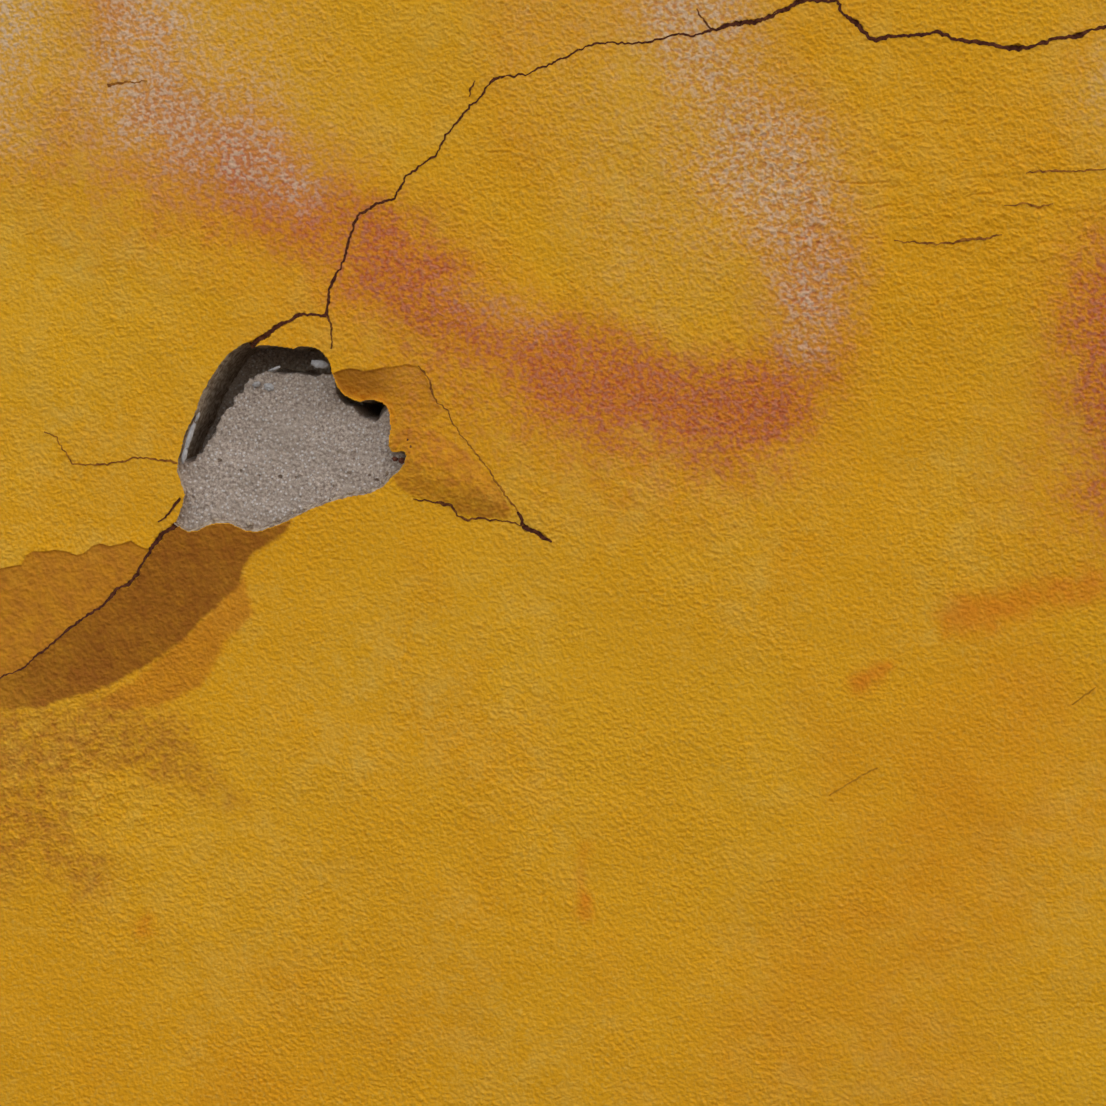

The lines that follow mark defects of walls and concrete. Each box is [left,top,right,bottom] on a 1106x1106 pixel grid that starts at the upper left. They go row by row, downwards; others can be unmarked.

crack [107,79,147,87]
crack [248,0,1106,349]
crack [44,431,177,466]
flaking render [174,342,412,532]
crack [413,366,552,542]
crack [0,497,181,679]